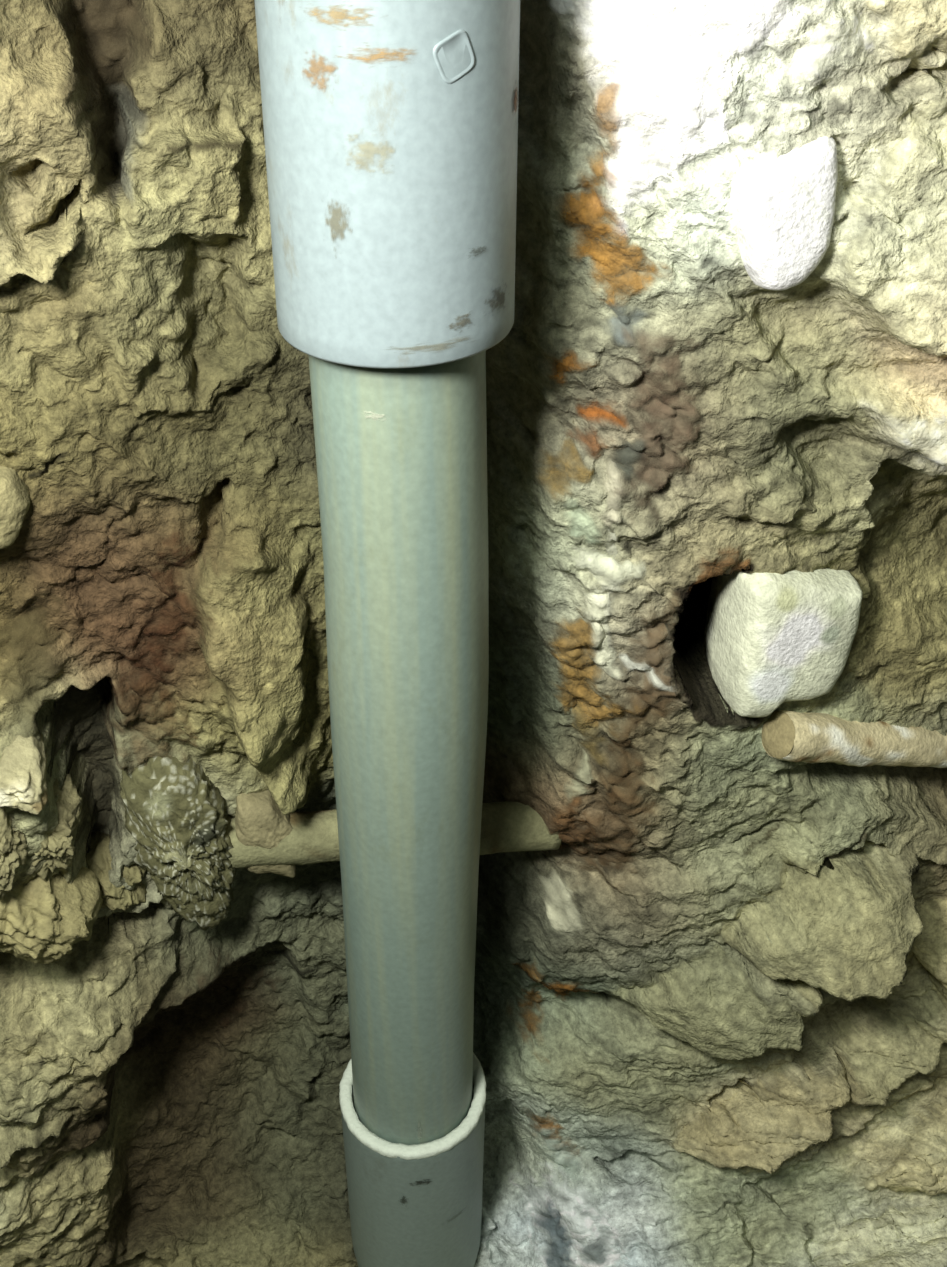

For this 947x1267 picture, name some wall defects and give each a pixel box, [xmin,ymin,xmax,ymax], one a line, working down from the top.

corrosion [596,83,619,134]
corrosion [563,150,655,303]
corrosion [540,404,620,492]
corrosion [552,619,626,762]
spalling [46,677,118,847]
spalling [235,789,293,849]
spalling [247,864,296,878]
corrosion [551,797,595,849]
crack [820,832,867,867]
damp [525,1129,623,1267]